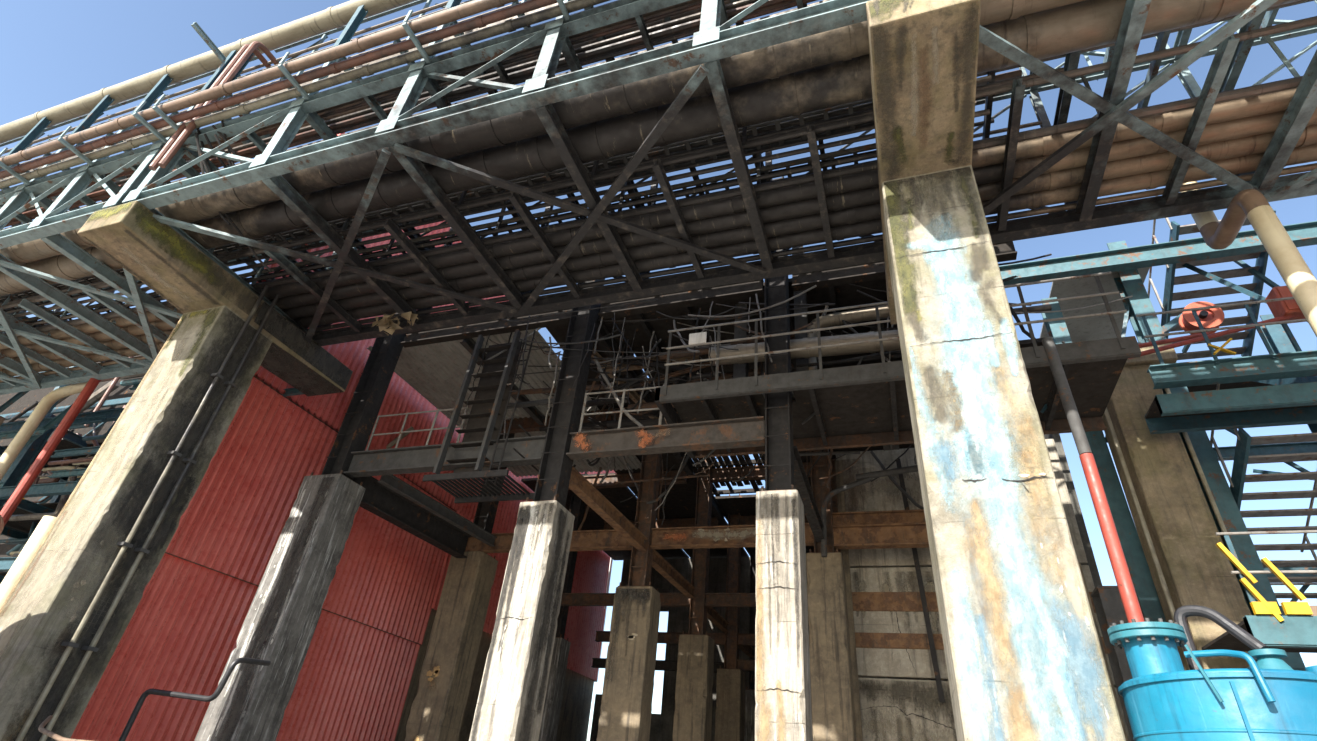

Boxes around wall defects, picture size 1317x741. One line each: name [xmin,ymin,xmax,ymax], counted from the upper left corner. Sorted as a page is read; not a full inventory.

leakage [873,8,976,189]
leakage [0,230,352,741]
leakage [471,506,530,741]
leakage [520,509,569,741]
corrosion [574,433,589,450]
corrosion [638,430,668,448]
leakage [792,499,800,651]
leakage [859,214,1104,741]
crack [962,472,1050,493]